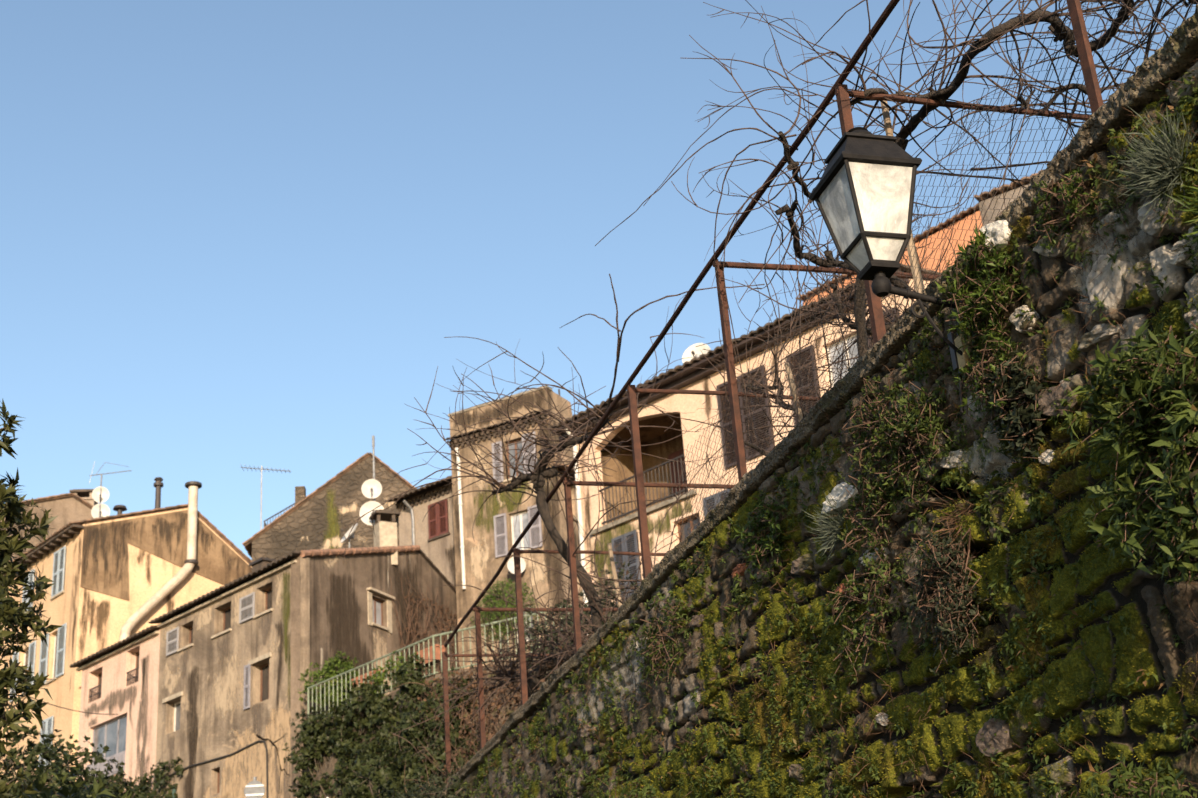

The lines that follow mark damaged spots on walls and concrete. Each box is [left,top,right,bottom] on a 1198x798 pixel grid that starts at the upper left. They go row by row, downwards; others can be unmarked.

damp [72,540,110,653]
damp [320,574,370,677]
damp [388,557,420,669]